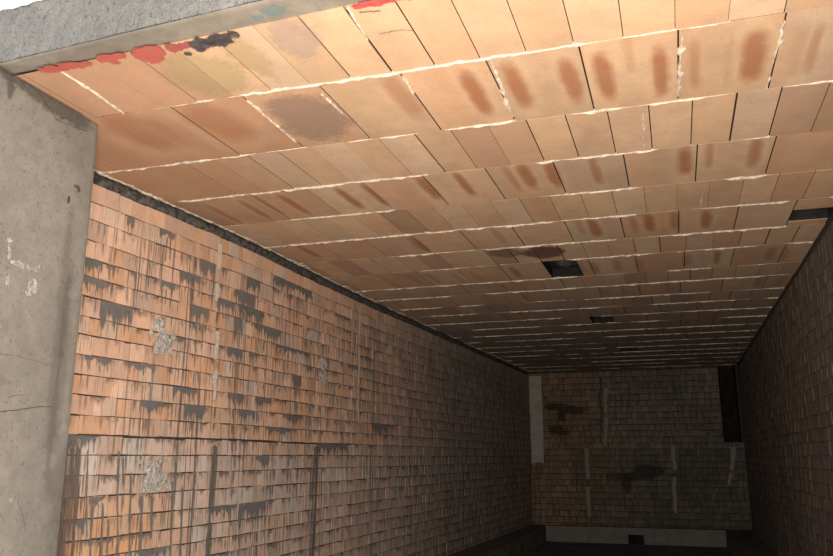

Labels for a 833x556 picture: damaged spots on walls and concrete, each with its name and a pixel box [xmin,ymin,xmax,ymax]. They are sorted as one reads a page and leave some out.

spalling [149,317,176,355]
damp [56,447,80,556]
spalling [138,455,174,494]
damp [309,447,318,556]